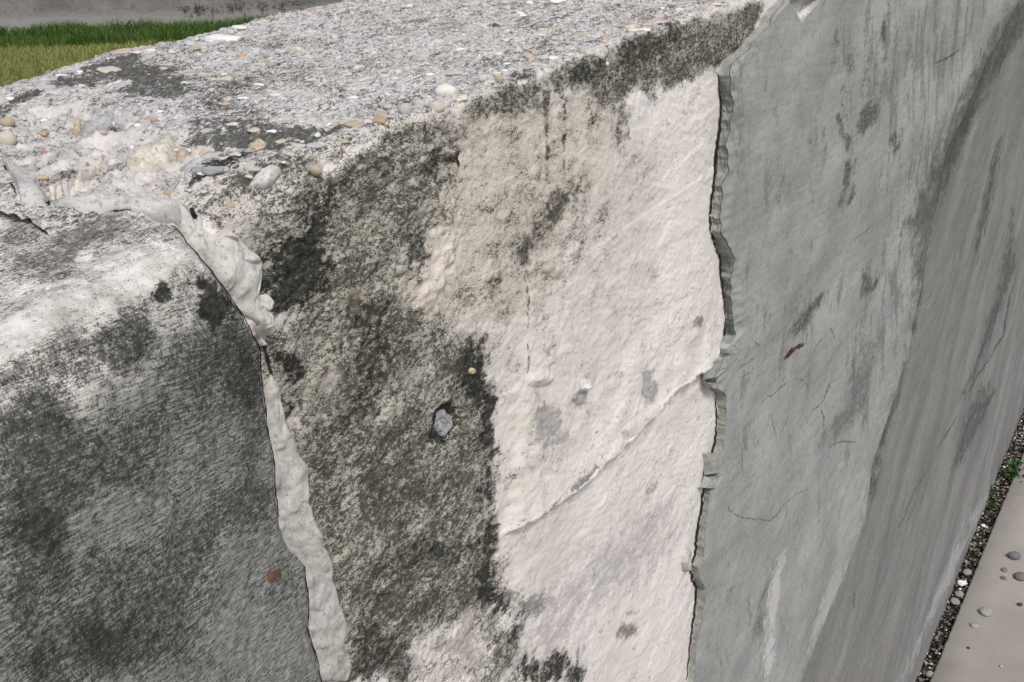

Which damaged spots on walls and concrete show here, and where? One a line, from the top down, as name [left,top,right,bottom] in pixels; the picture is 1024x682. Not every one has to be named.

leakage [151,281,174,303]
crack [171,225,279,517]
leakage [183,276,305,411]
leakage [258,184,345,315]
leakage [338,295,401,435]
leakage [422,136,461,178]
leakage [519,160,591,282]
leakage [542,20,686,159]
crack [709,71,726,336]
leakage [351,332,657,682]
crack [686,379,809,681]
crack [304,566,322,682]